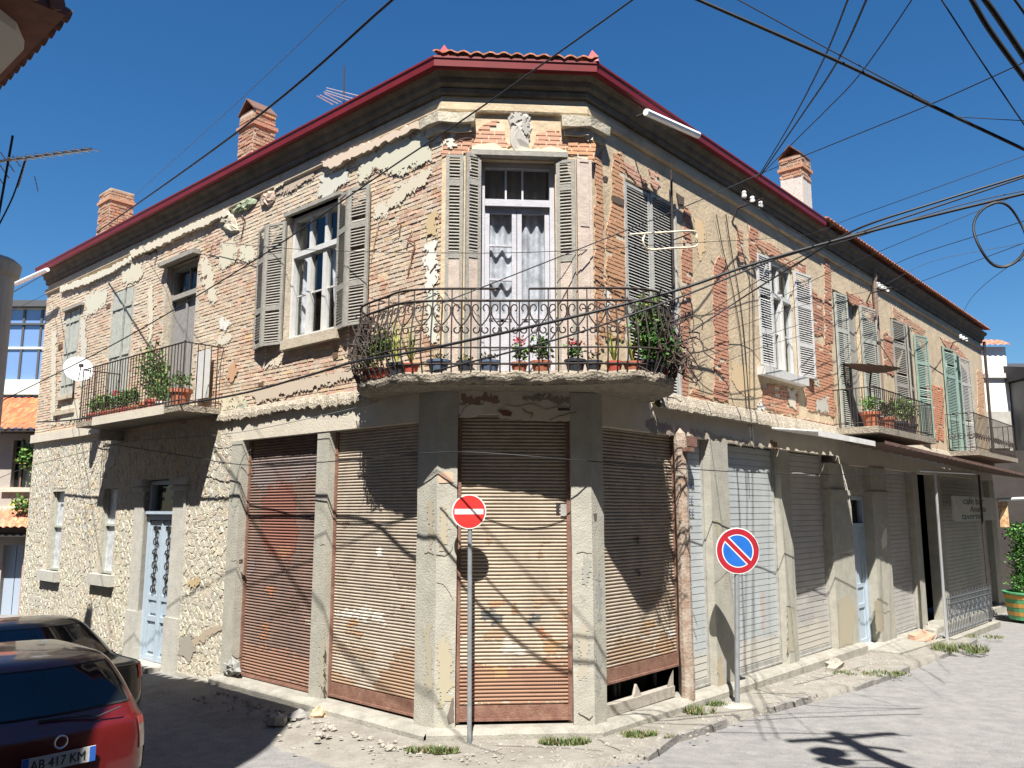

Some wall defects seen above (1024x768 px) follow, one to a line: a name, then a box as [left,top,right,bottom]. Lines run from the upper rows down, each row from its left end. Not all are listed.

spalling [680,207,836,427]
spalling [846,291,895,376]
spalling [893,307,944,442]
spalling [940,337,985,418]
rust [260,467,300,566]
rust [242,621,309,687]
rust [460,608,510,642]
rust [455,627,568,705]
rust [532,588,568,625]